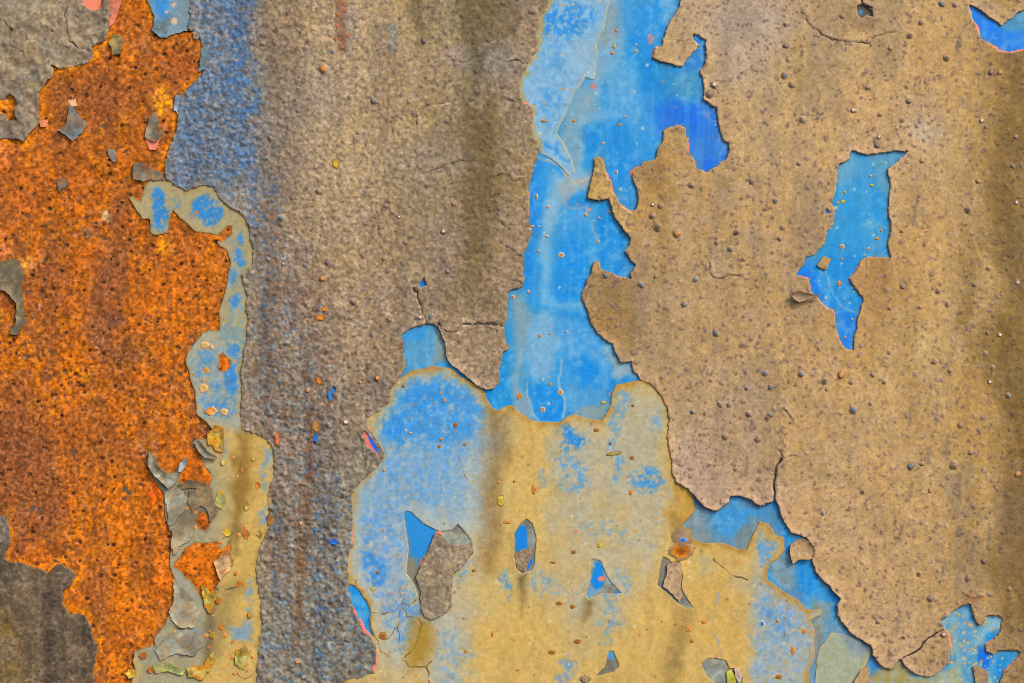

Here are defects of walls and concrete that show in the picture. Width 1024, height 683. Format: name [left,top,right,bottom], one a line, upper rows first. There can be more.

crack [806,17,893,44]
corrosion [0,0,248,683]
peeling [125,176,281,683]
crack [412,287,503,333]
peeling [328,0,1024,683]
crack [773,450,783,500]